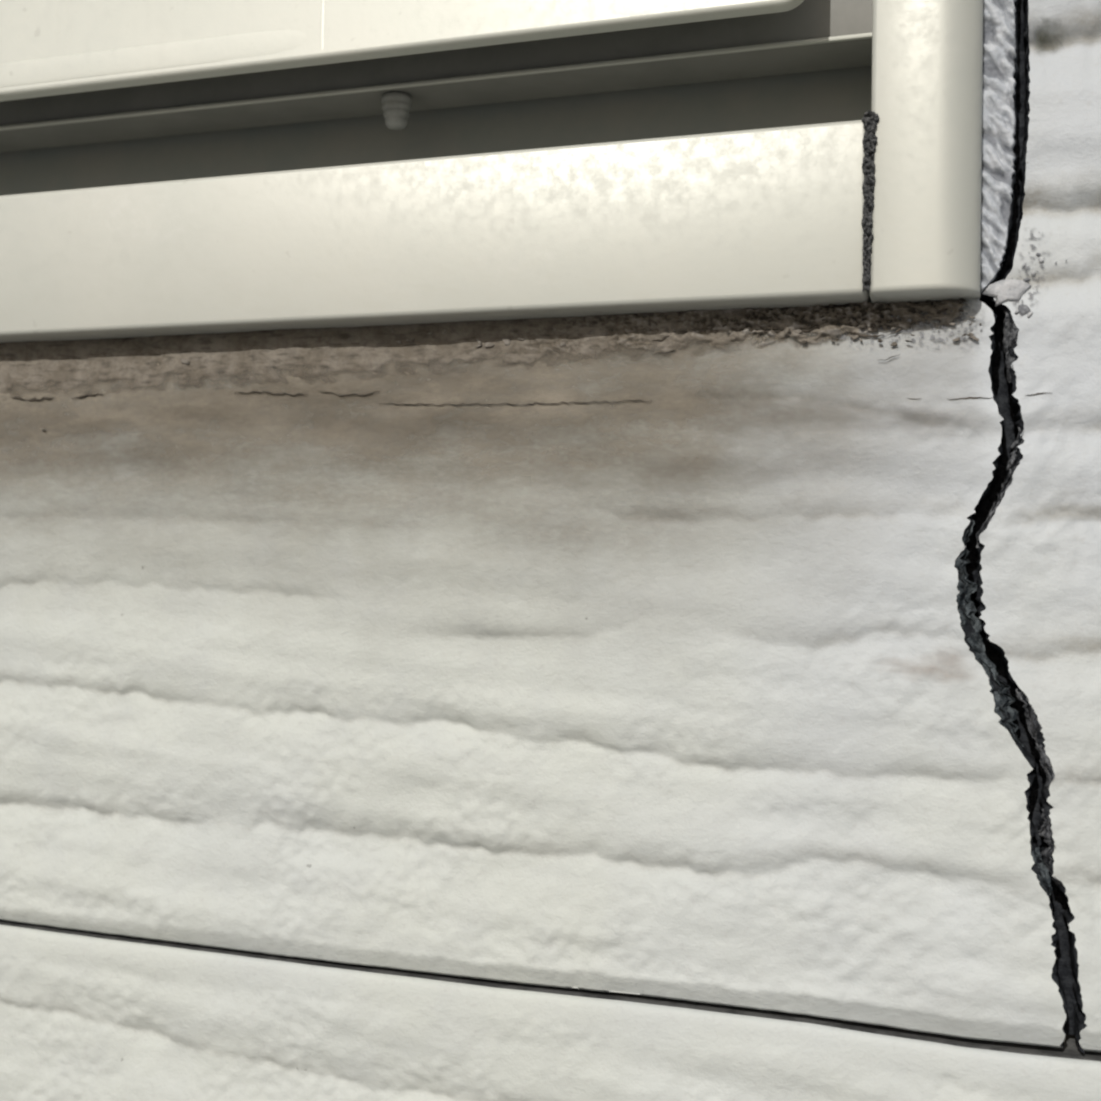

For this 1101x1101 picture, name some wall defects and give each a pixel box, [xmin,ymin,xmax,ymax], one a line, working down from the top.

crack [653,326,820,355]
crack [10,393,102,401]
damp [0,316,797,498]
crack [235,390,652,406]
crack [848,0,1087,1053]